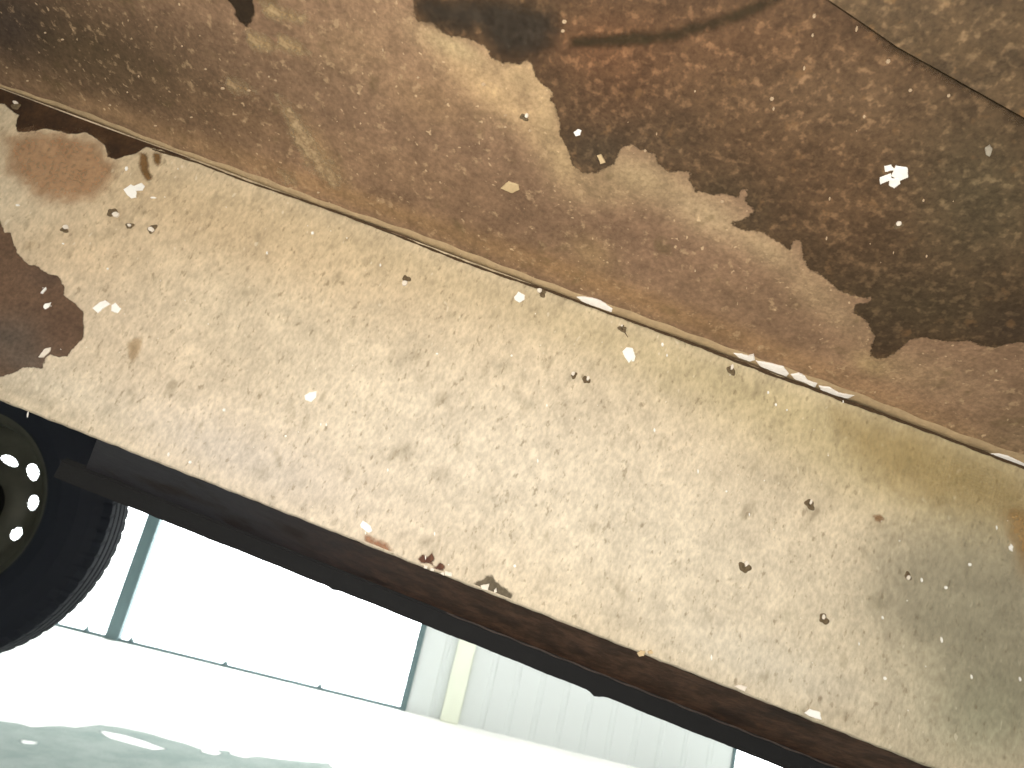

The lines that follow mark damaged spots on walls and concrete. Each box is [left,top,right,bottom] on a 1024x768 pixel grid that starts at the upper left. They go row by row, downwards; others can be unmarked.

damp [0,89,190,180]
peeling [880,165,908,188]
peeling [622,347,636,362]
peeling [756,360,854,399]